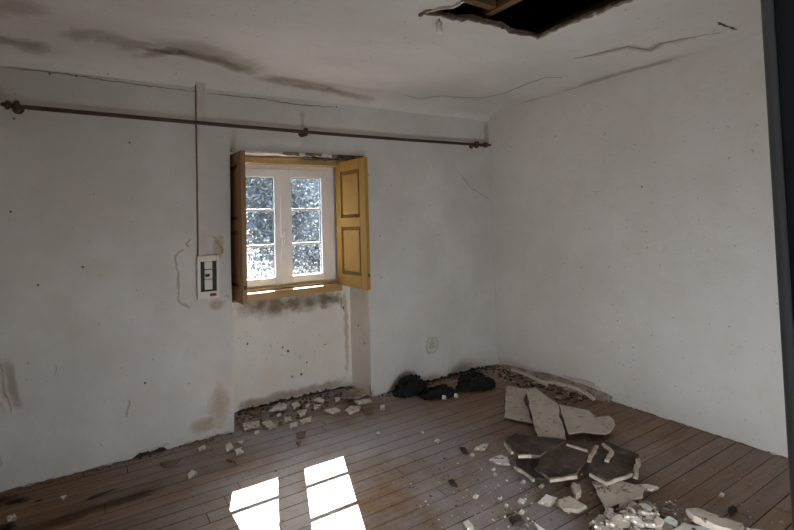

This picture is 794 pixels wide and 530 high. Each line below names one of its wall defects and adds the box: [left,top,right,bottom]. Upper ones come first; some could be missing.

flaking render [418,0,634,40]
crack [574,22,737,59]
flaking render [234,386,372,430]